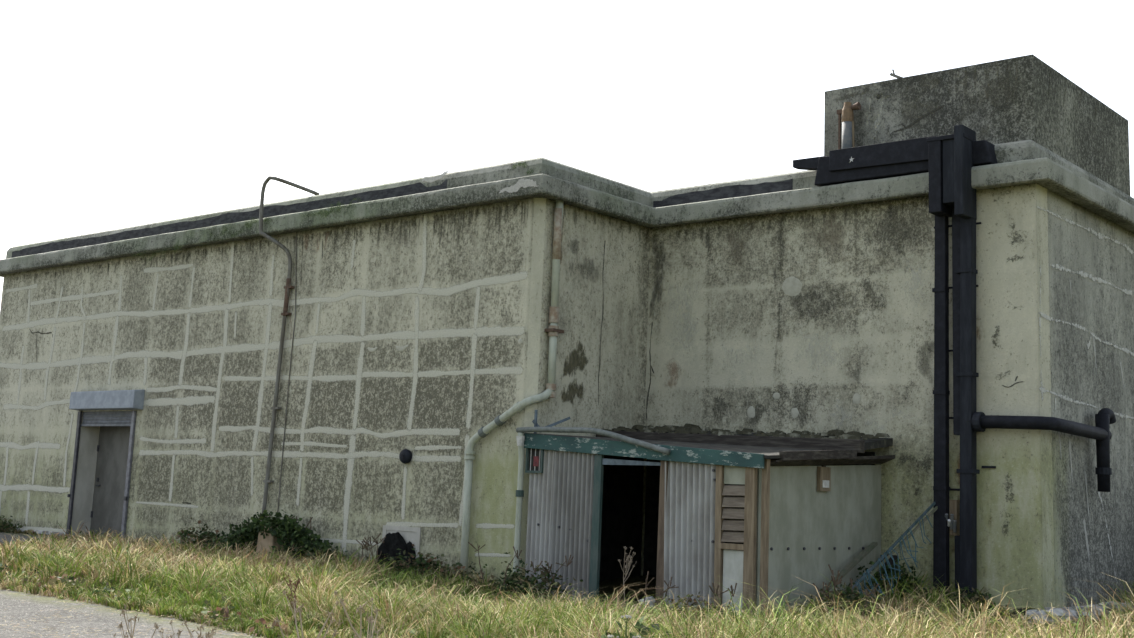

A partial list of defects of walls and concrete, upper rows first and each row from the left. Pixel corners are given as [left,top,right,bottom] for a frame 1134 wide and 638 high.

spalling [499,178,539,194]
damp [561,342,587,403]
damp [747,402,767,424]
damp [784,381,813,425]